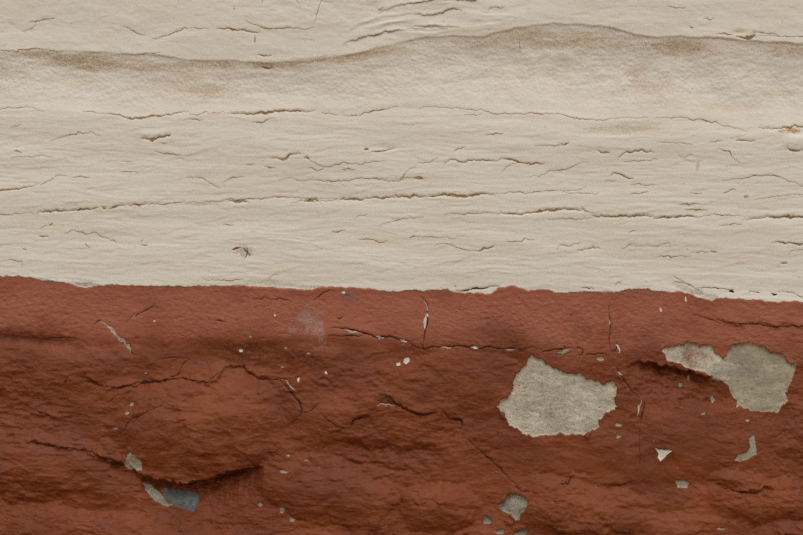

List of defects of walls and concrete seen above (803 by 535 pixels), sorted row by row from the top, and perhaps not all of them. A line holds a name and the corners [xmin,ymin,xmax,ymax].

crack [123,0,322,69]
crack [691,18,803,40]
crack [0,106,803,252]
crack [655,242,801,297]
crack [94,304,155,355]
peeling [497,355,617,439]
peeling [662,341,797,422]
peeling [124,452,142,471]
crack [64,356,538,494]
peeling [735,435,757,462]
peeling [142,482,200,512]
peeling [483,493,528,535]